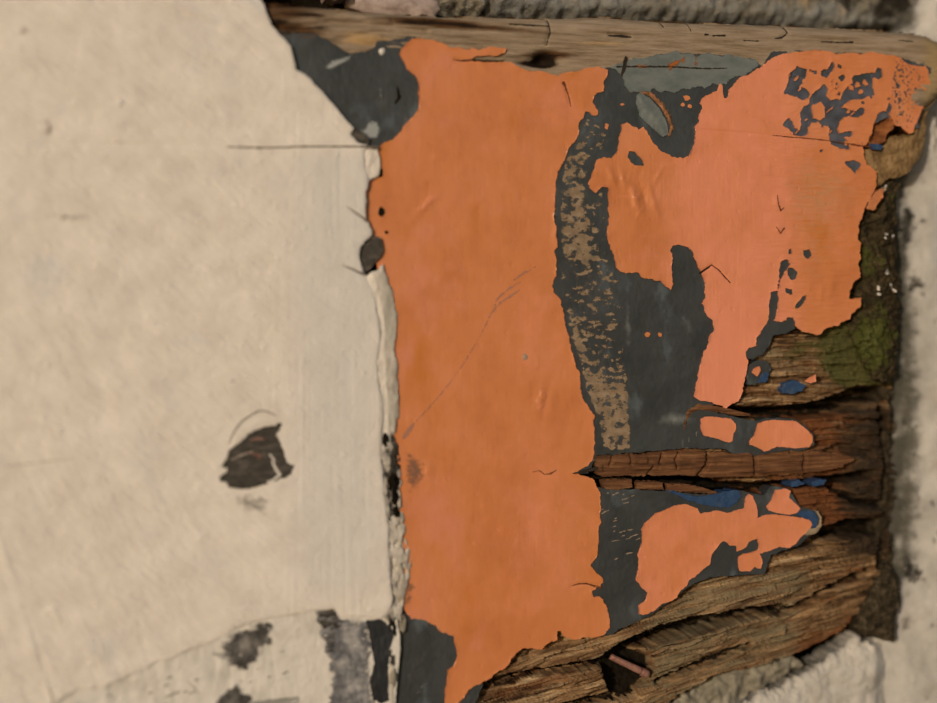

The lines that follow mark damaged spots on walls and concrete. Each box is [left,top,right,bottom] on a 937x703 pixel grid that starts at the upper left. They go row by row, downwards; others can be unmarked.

peeling [277,31,419,150]
peeling [783,52,882,152]
crack [227,143,378,151]
peeling [845,160,861,173]
peeling [864,188,885,211]
peeling [359,231,388,273]
peeling [552,50,814,474]
peeling [219,410,294,489]
hole [387,472,400,518]
peeling [591,477,826,636]
peeling [58,608,457,703]
peeling [458,683,483,703]